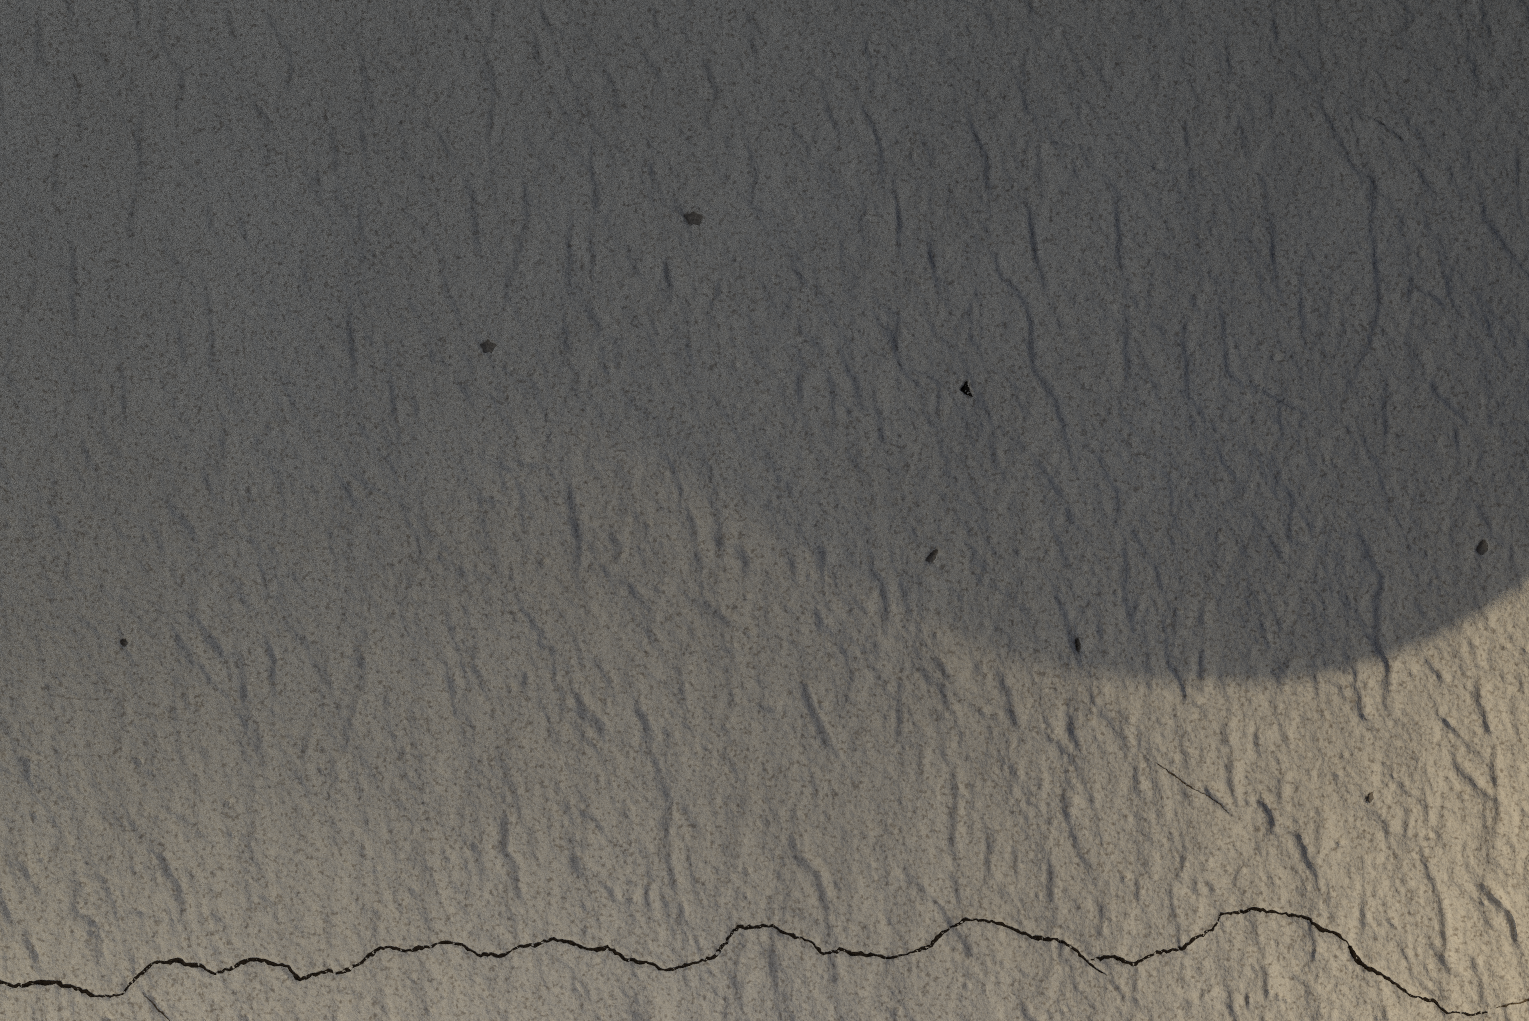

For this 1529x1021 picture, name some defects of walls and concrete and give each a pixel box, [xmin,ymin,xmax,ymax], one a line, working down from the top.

crack [0,907,1529,1021]